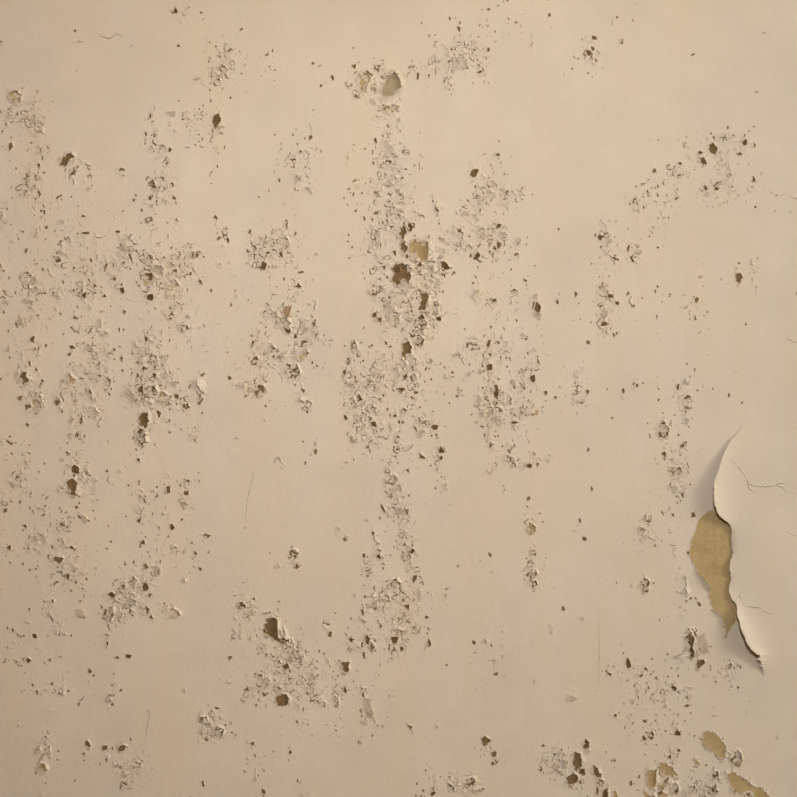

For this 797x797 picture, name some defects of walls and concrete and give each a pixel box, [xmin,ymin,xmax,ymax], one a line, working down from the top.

peeling [0,24,249,710]
peeling [196,703,237,746]
peeling [244,740,274,797]
peeling [211,0,606,765]
peeling [533,363,797,797]
peeling [572,124,778,346]